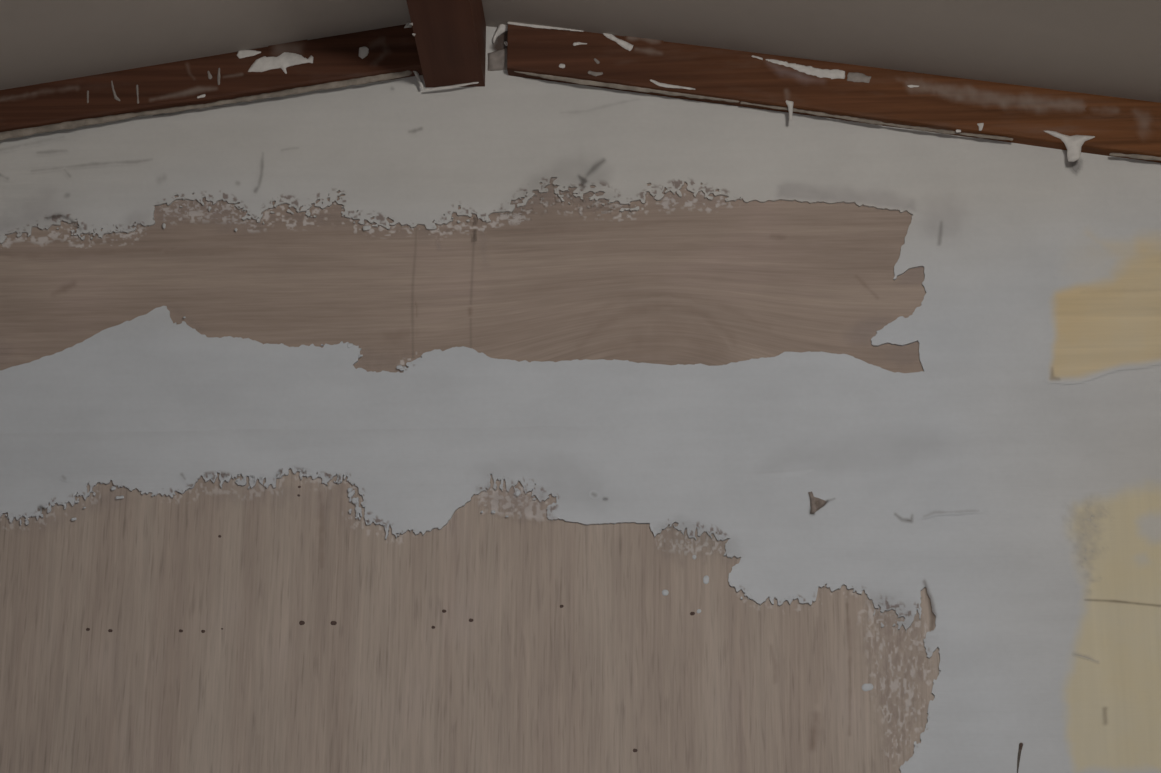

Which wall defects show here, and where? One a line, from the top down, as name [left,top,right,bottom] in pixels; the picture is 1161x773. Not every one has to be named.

peeling [0,171,926,375]
peeling [1046,222,1161,385]
peeling [0,466,941,773]
peeling [1054,473,1161,773]